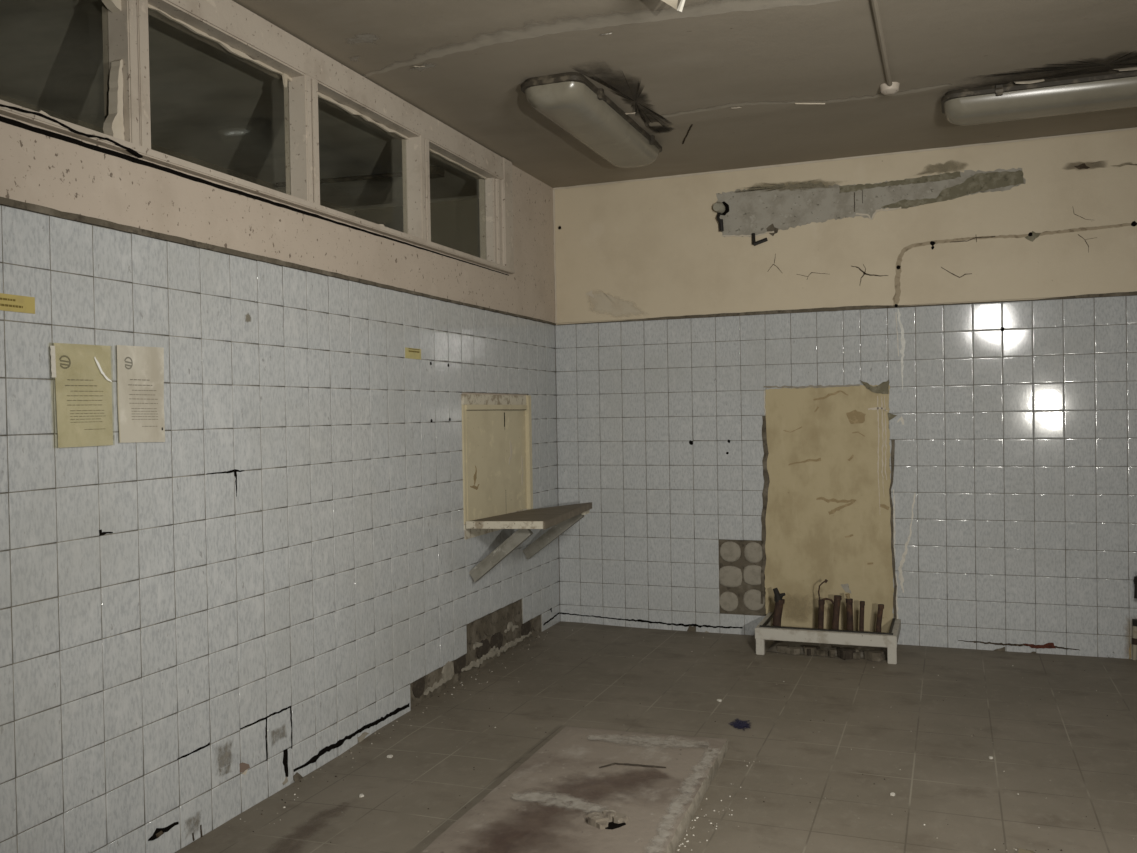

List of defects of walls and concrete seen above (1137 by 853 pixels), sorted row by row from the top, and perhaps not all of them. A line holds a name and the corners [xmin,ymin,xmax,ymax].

flaking render [716,162,1026,237]
crack [852,265,888,283]
crack [207,469,245,497]
peeling [410,599,541,709]
crack [958,640,1079,653]
crack [240,703,409,785]